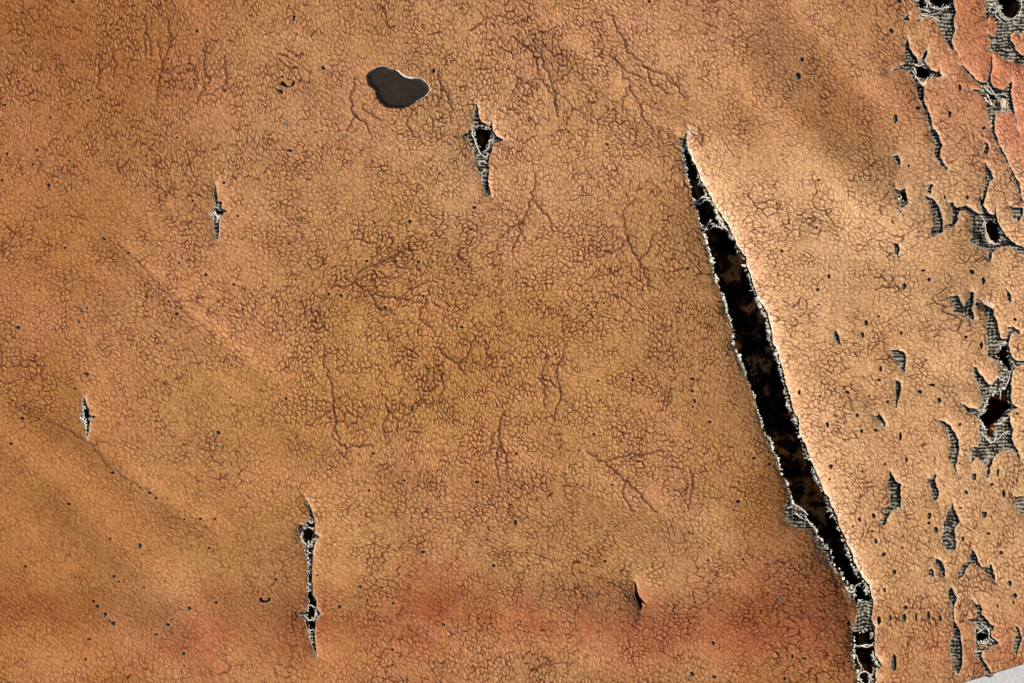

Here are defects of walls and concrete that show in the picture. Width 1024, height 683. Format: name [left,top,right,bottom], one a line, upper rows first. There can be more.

peeling [896,0,957,54]
peeling [985,0,1024,65]
peeling [925,126,1024,262]
peeling [855,350,906,433]
peeling [939,269,1024,515]
peeling [877,474,1017,674]
peeling [1013,626,1022,656]